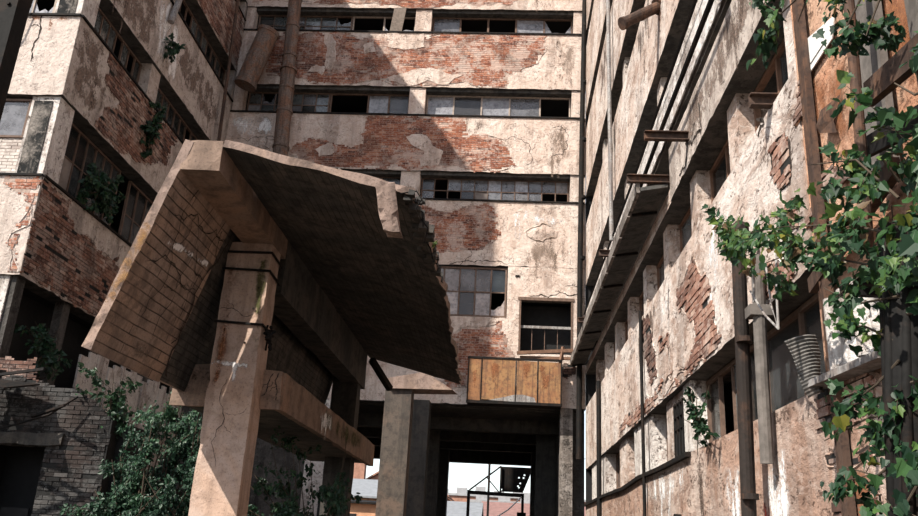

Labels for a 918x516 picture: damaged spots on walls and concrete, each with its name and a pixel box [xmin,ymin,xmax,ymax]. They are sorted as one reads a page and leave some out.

peeling [295,31,547,88]